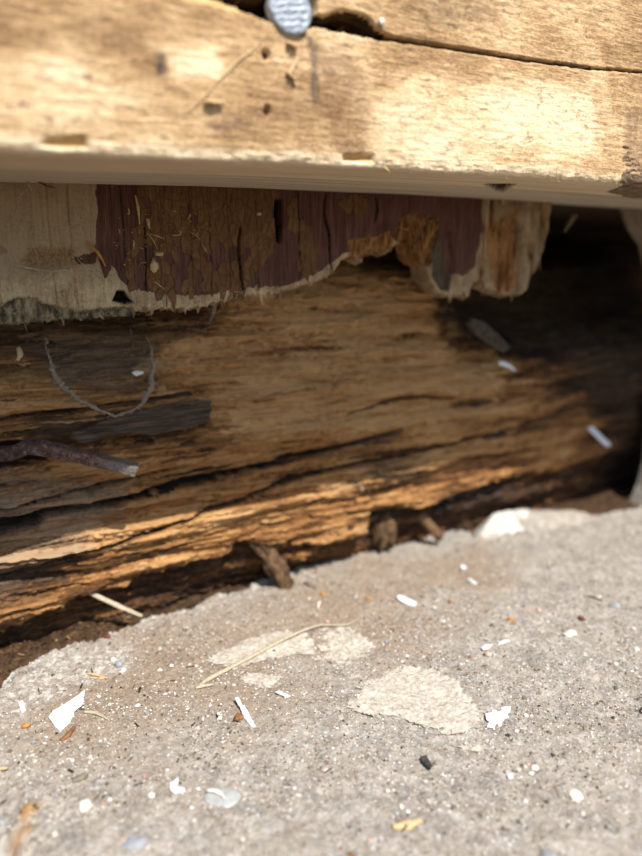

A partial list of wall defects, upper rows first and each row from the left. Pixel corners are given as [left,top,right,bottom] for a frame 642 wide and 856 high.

crack [216,0,267,19]
crack [308,11,392,42]
peeling [124,185,278,312]
spalling [348,213,440,266]
crack [0,402,127,419]
crack [0,448,339,509]